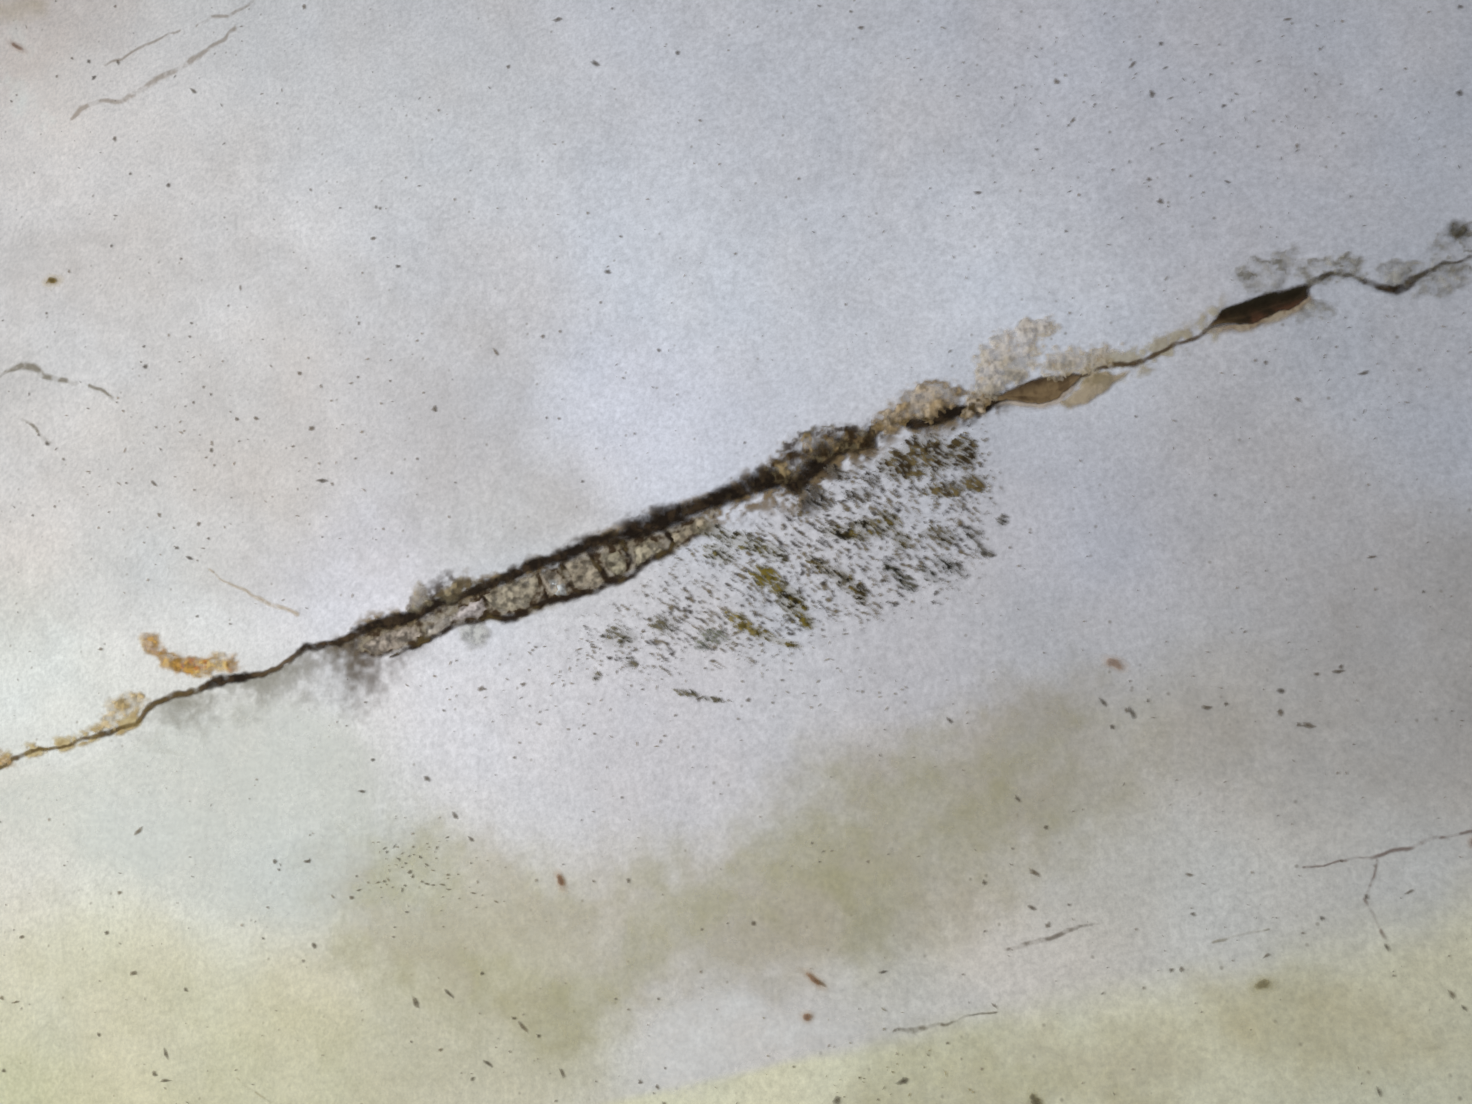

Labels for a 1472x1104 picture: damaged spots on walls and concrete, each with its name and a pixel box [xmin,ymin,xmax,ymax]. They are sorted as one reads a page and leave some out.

rust [100,693,143,731]
rust [142,635,236,677]
crack [0,256,1470,769]
mould [583,424,1007,703]